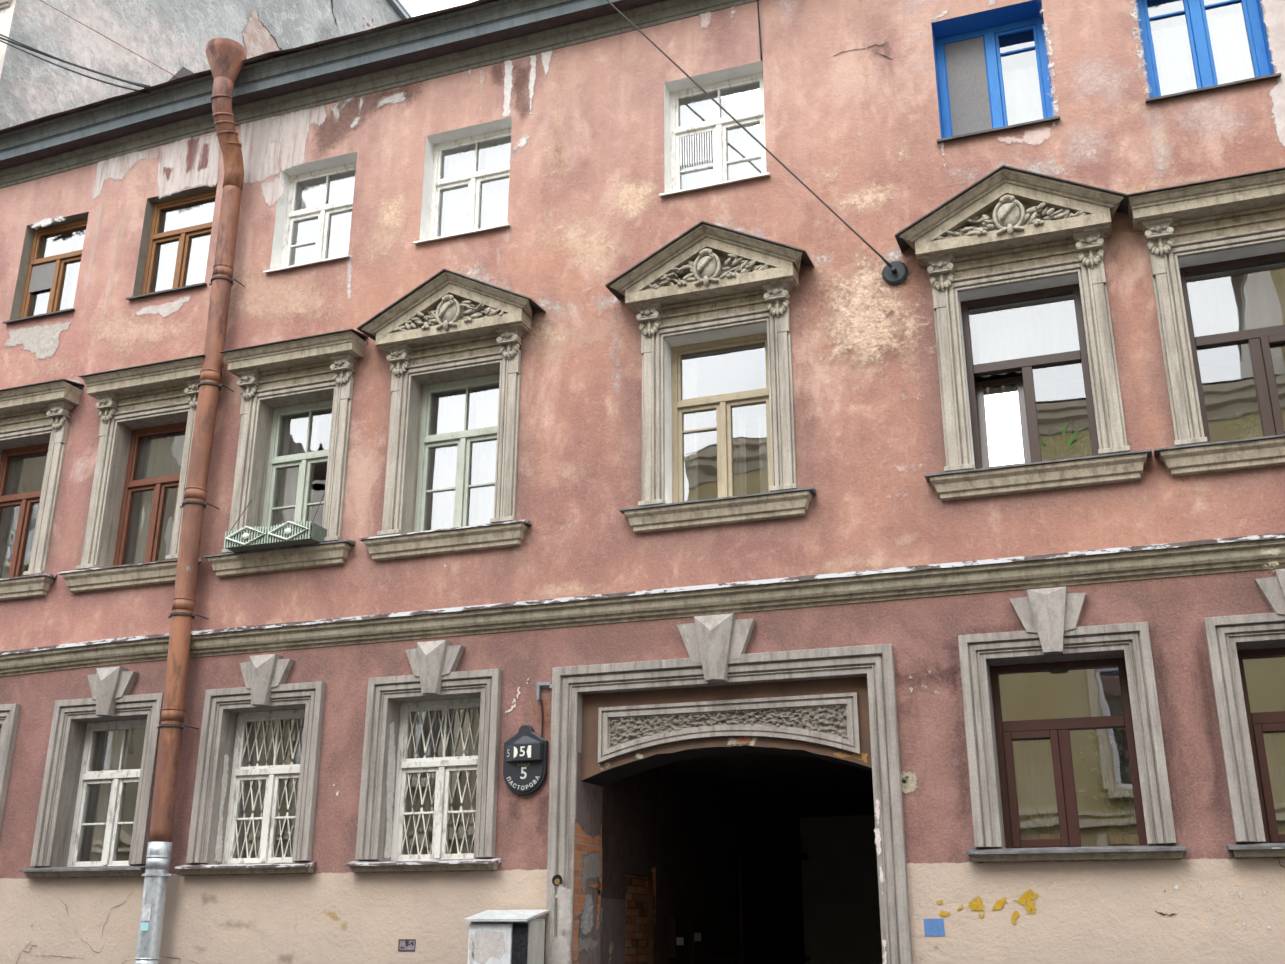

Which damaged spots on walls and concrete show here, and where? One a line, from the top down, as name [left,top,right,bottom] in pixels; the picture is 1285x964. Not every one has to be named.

flaking render [242,10,281,59]
peeling [378,92,406,107]
damp [502,60,513,117]
damp [529,51,560,114]
flaking render [1261,0,1285,147]
peeling [92,133,220,200]
peeling [240,97,362,206]
flaking render [4,320,71,376]
peeling [96,296,190,352]
flaking render [552,821,602,964]